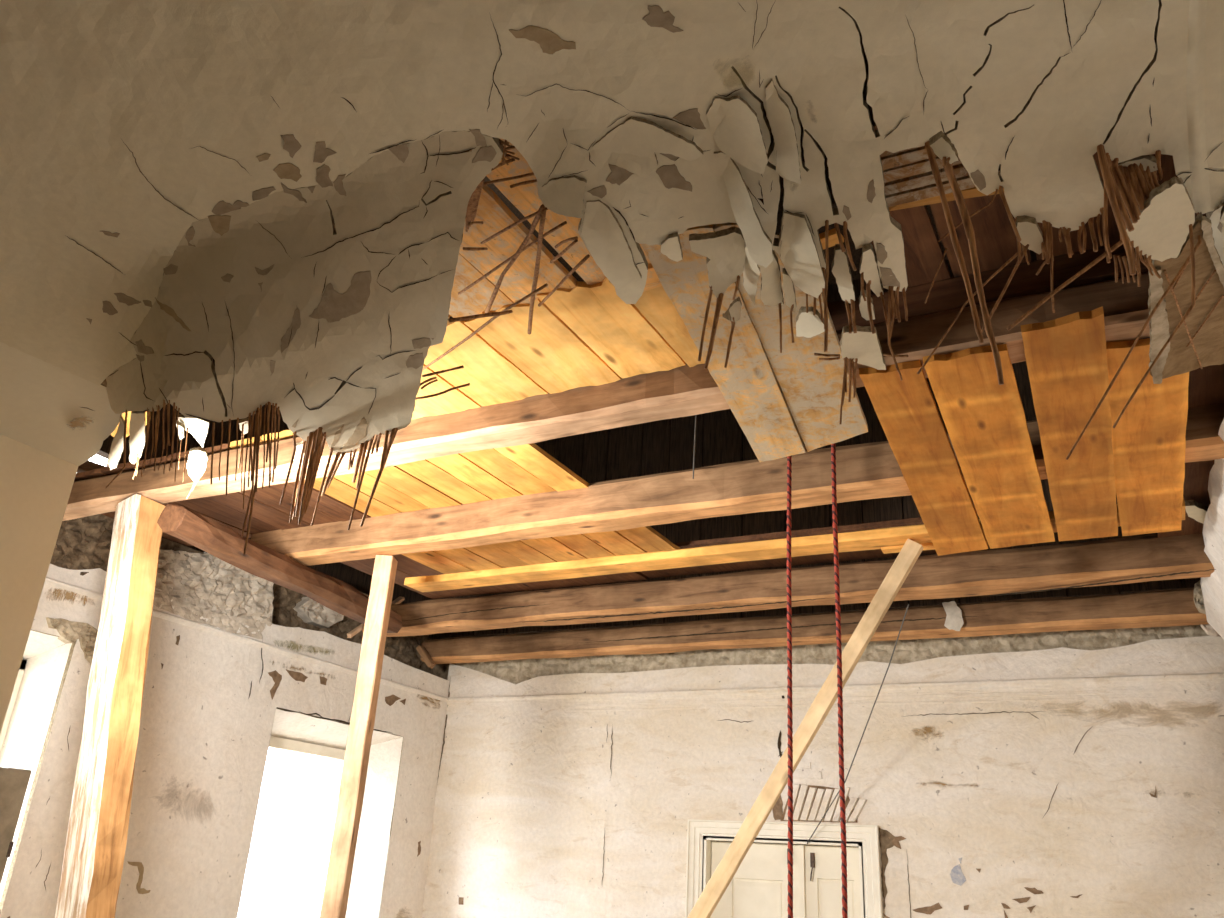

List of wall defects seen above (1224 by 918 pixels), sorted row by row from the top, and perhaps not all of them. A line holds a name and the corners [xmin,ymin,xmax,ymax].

crack [1062,0,1101,57]
crack [487,12,709,180]
crack [718,0,836,235]
crack [859,15,947,139]
crack [257,130,476,414]
crack [613,201,648,265]
peeling [542,79,825,298]
flaking render [50,514,114,576]
flaking render [153,550,363,644]
flaking render [384,635,423,669]
flaking render [455,643,847,684]
flaking render [858,625,1221,664]